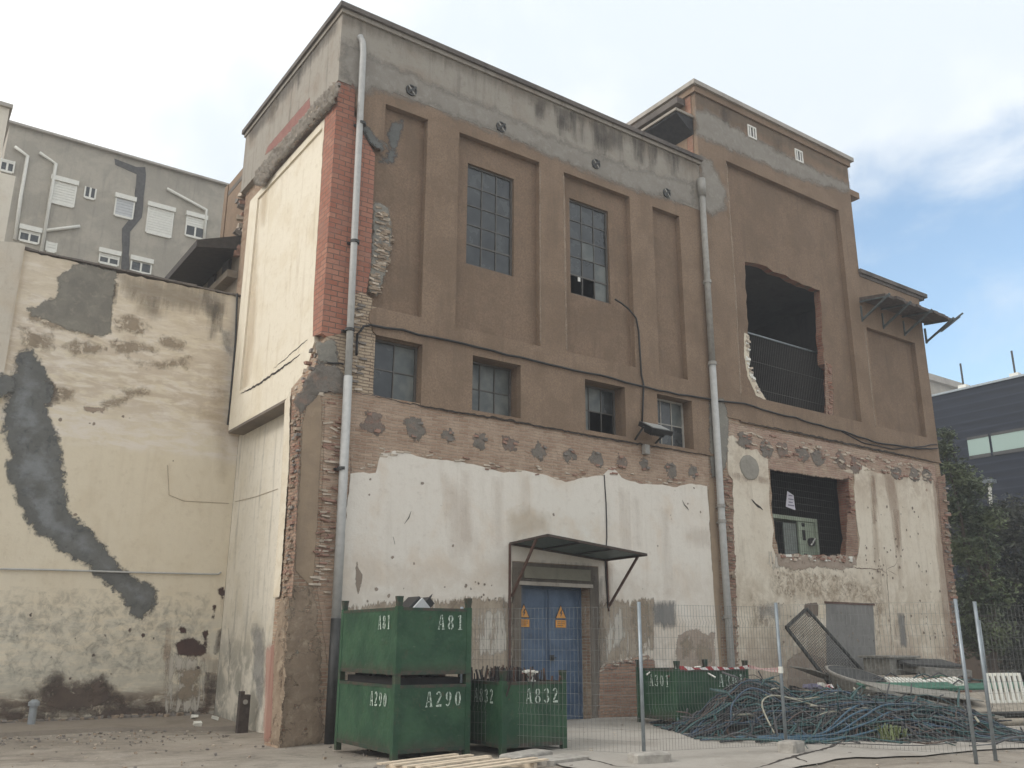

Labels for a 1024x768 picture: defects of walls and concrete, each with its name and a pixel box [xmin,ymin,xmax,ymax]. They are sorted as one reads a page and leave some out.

spalling [253,82,341,187]
spalling [737,331,766,400]
spalling [823,359,834,415]
spalling [282,202,715,679]
spalling [728,423,963,678]
water stain [0,675,208,721]
peeling [165,626,208,713]
peeling [598,598,655,718]